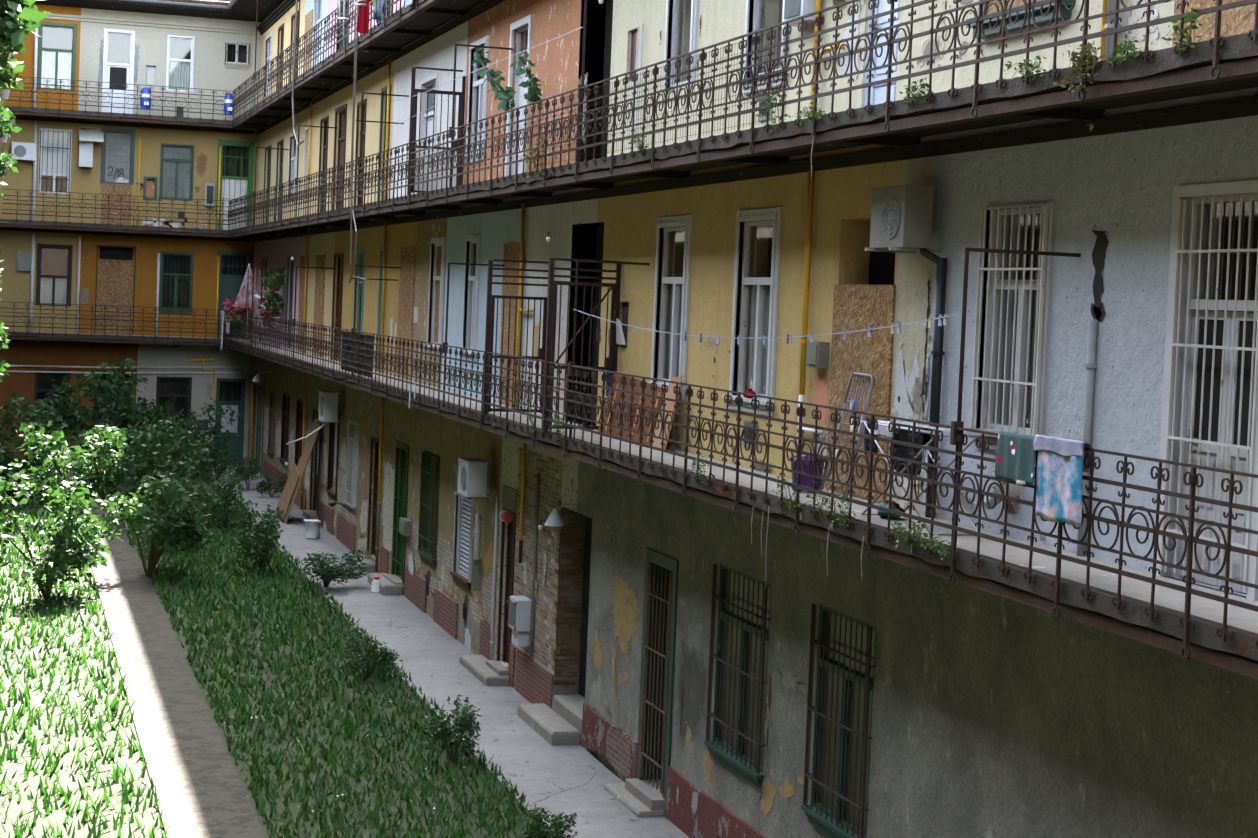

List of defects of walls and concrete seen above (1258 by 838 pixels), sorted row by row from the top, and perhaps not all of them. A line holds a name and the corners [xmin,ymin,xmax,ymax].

peeling [589,572,640,778]